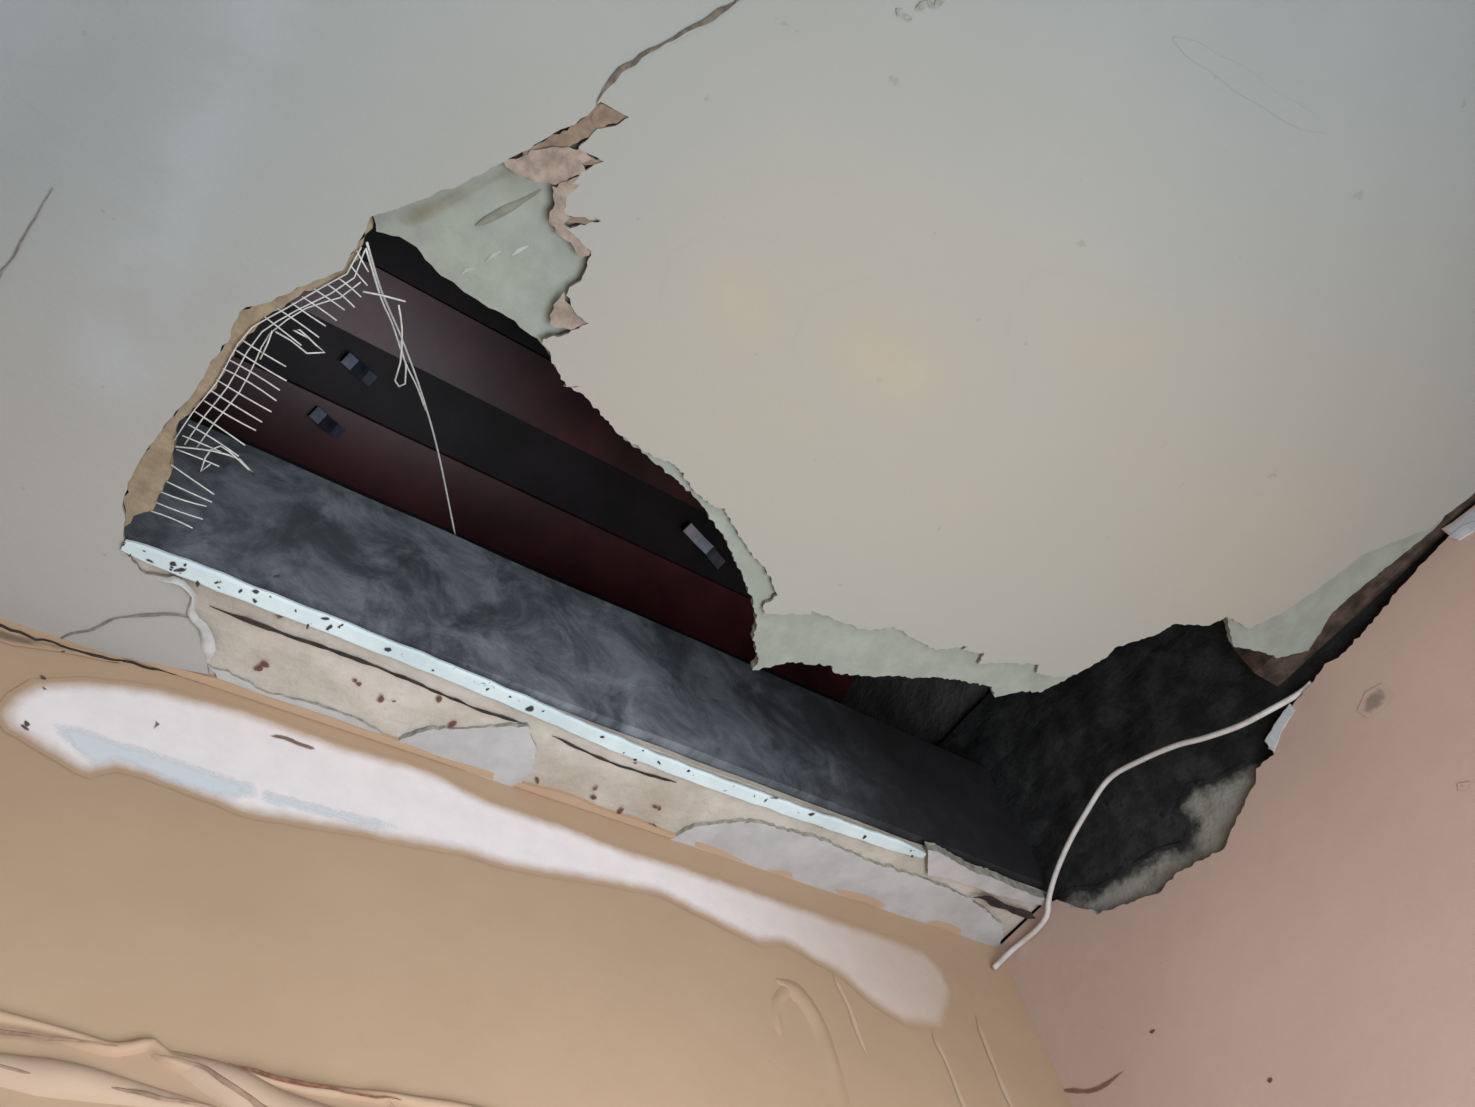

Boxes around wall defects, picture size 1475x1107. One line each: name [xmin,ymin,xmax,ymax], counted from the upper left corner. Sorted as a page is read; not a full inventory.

crack [596,0,741,105]
crack [0,188,53,278]
flaking render [131,533,1449,947]